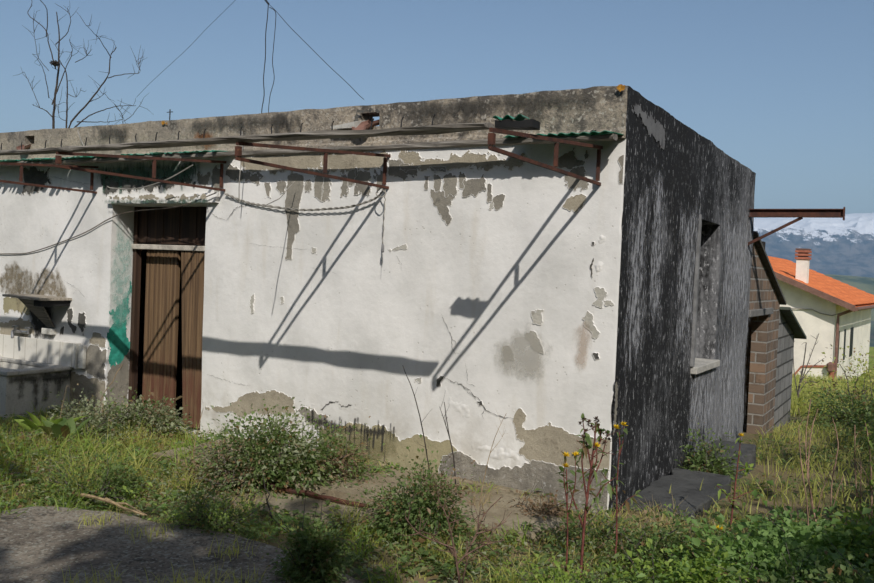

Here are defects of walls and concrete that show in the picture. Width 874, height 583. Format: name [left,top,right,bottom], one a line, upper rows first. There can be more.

peeling [101,150,526,260]
peeling [558,147,590,214]
peeling [0,297,35,337]
peeling [525,309,545,355]
peeling [582,286,614,339]
crack [442,317,511,418]
spalling [205,376,619,516]